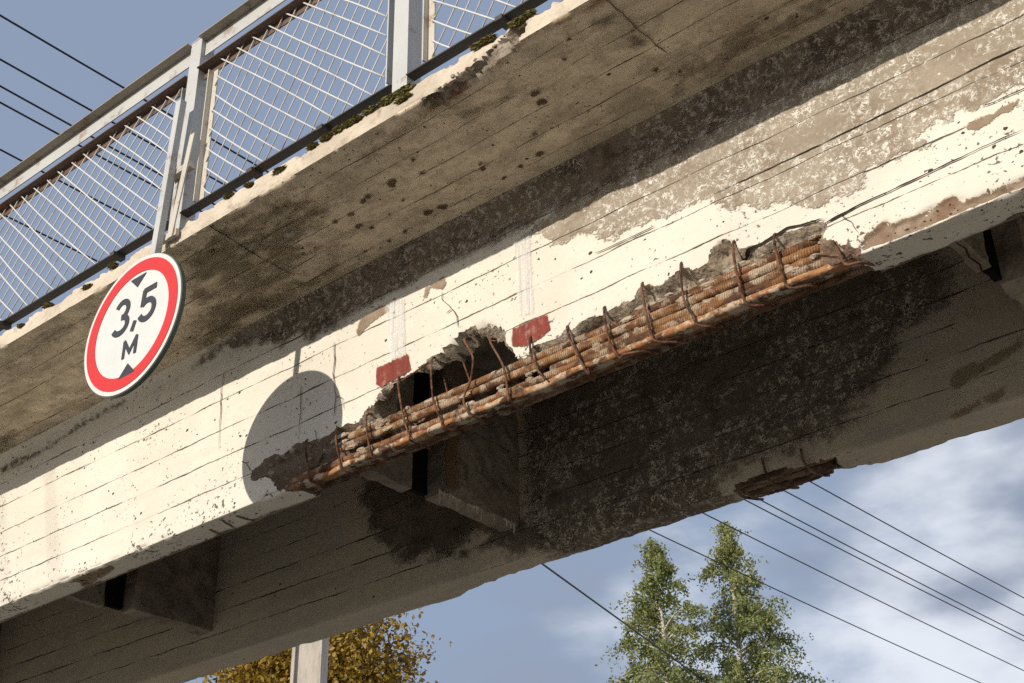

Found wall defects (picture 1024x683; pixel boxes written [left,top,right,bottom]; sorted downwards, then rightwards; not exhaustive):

damp [196,0,968,366]
peeling [251,0,1024,564]